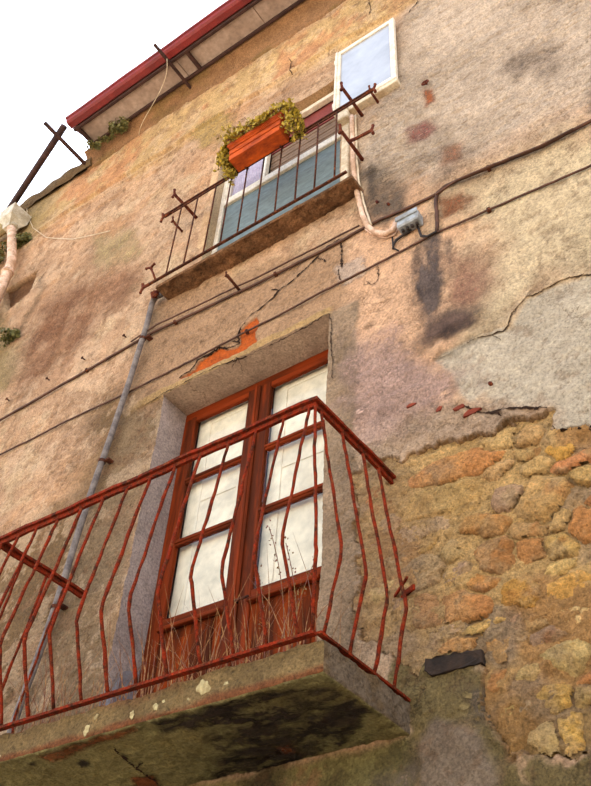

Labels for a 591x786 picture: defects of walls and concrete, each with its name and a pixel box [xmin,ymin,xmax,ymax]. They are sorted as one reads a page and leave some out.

rust [410,124,434,142]
spalling [190,320,259,376]
crack [153,239,343,400]
water stain [415,234,487,345]
crack [467,272,591,343]
spalling [352,410,591,761]
crack [113,746,158,784]
water stain [156,689,370,786]